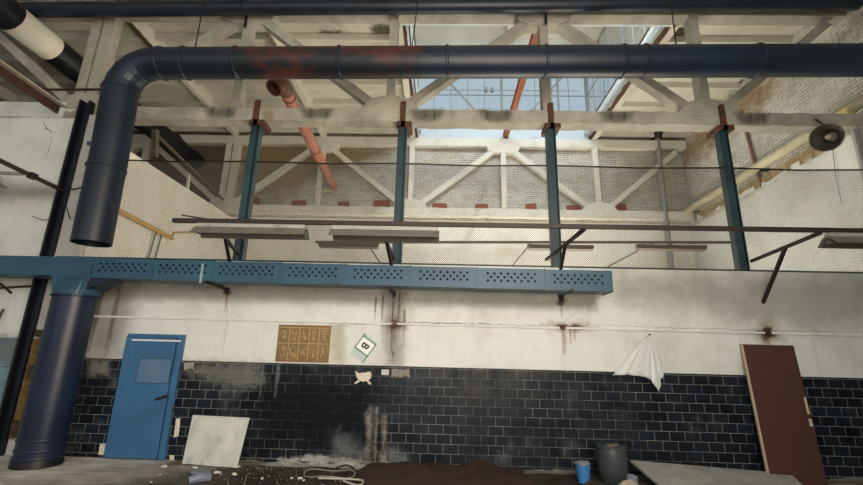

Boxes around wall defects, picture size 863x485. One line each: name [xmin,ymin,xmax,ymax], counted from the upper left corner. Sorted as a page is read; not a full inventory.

leakage [259,407,387,470]